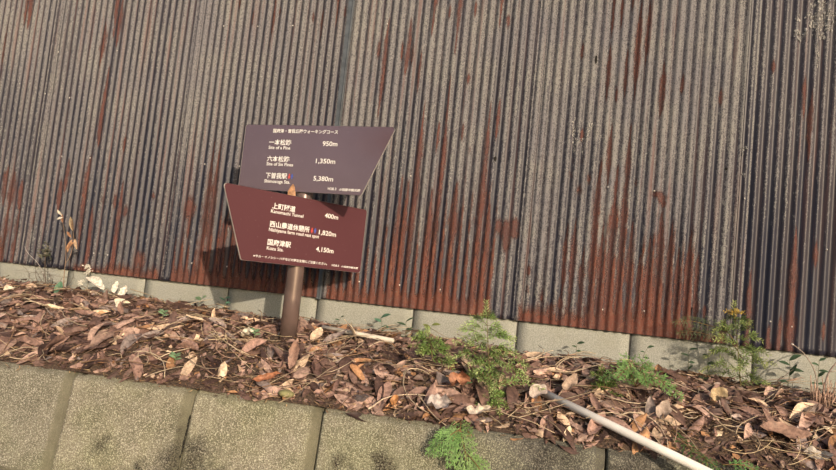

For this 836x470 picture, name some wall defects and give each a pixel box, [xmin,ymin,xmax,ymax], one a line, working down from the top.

rust [606,0,652,102]
rust [0,166,23,263]
rust [74,156,158,279]
rust [170,142,288,294]
rust [302,75,519,317]
rust [518,125,726,344]
damp [373,452,396,470]